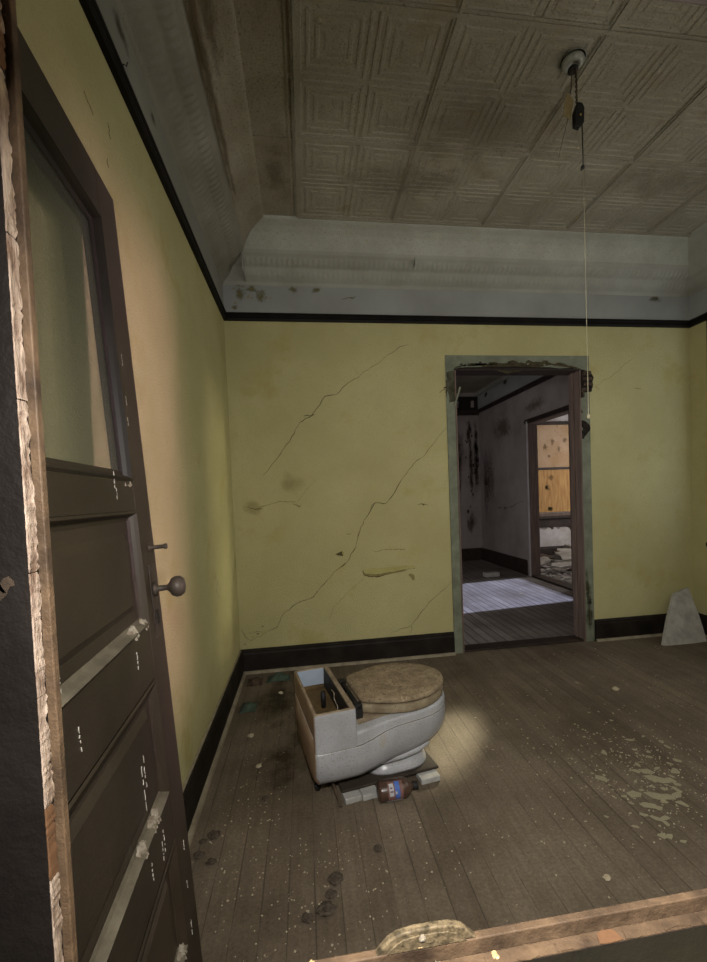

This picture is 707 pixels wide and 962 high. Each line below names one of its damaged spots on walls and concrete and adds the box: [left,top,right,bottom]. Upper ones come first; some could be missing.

crack [268,345,405,470]
damp [458,423,489,504]
flaking render [441,360,594,410]
crack [241,435,440,641]